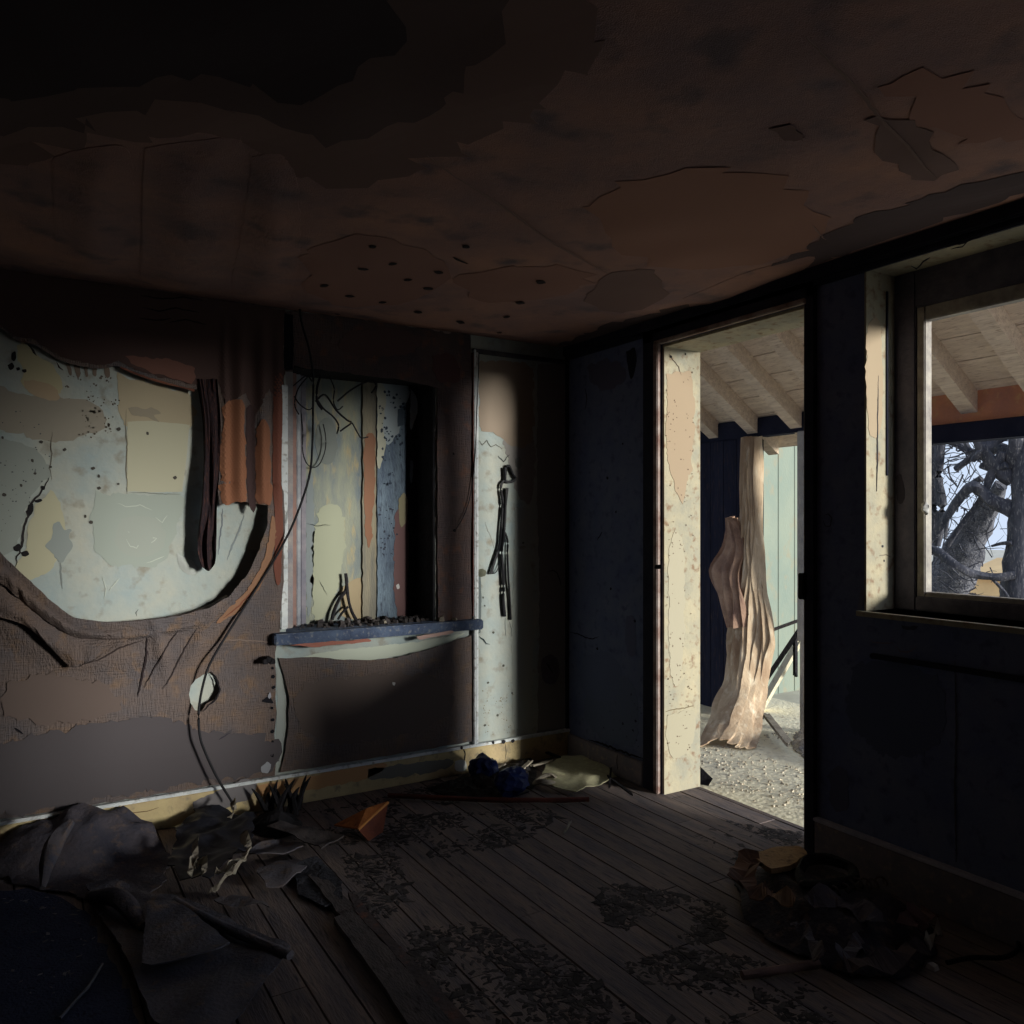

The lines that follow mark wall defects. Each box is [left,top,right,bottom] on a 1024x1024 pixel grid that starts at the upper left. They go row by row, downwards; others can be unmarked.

peeling [8,343,63,394]
peeling [376,383,410,469]
crack [15,437,53,567]
peeling [13,459,66,580]
peeling [479,577,495,634]